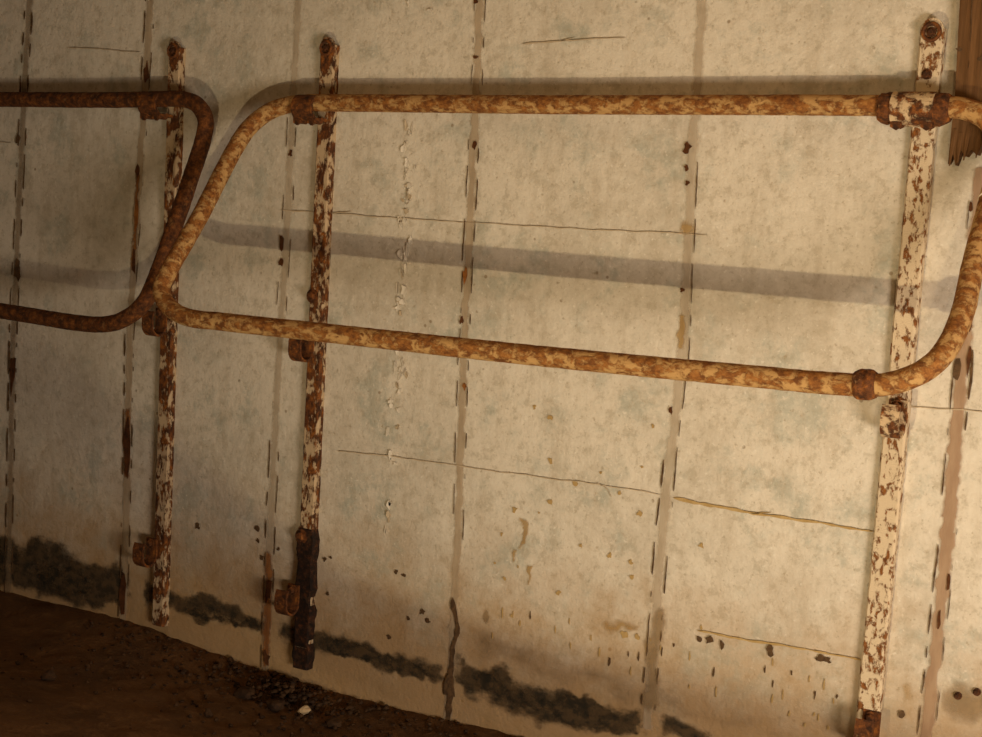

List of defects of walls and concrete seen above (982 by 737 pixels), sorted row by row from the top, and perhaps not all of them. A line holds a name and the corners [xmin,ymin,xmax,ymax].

damp [512,507,532,584]
mould [0,536,128,609]
damp [144,583,153,603]
damp [168,592,265,630]
damp [281,624,295,645]
damp [605,623,675,675]
damp [313,632,640,735]
damp [947,688,982,719]
mould [664,717,705,737]